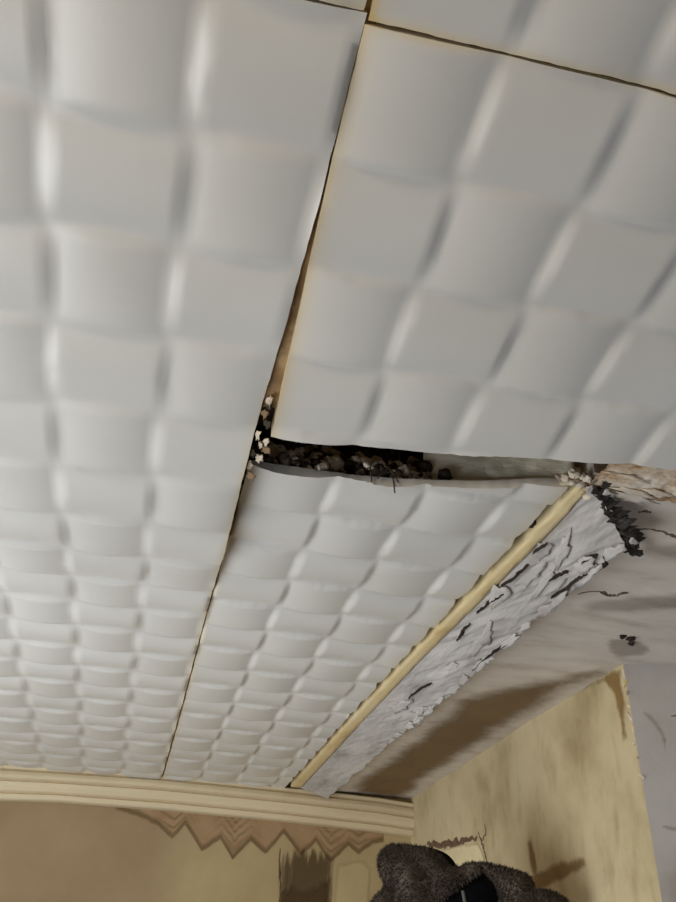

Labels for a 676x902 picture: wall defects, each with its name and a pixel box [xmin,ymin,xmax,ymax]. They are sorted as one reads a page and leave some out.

spalling [241,395,280,486]
spalling [306,443,423,466]
crack [638,510,676,538]
peeling [388,463,676,745]
crack [578,590,628,598]